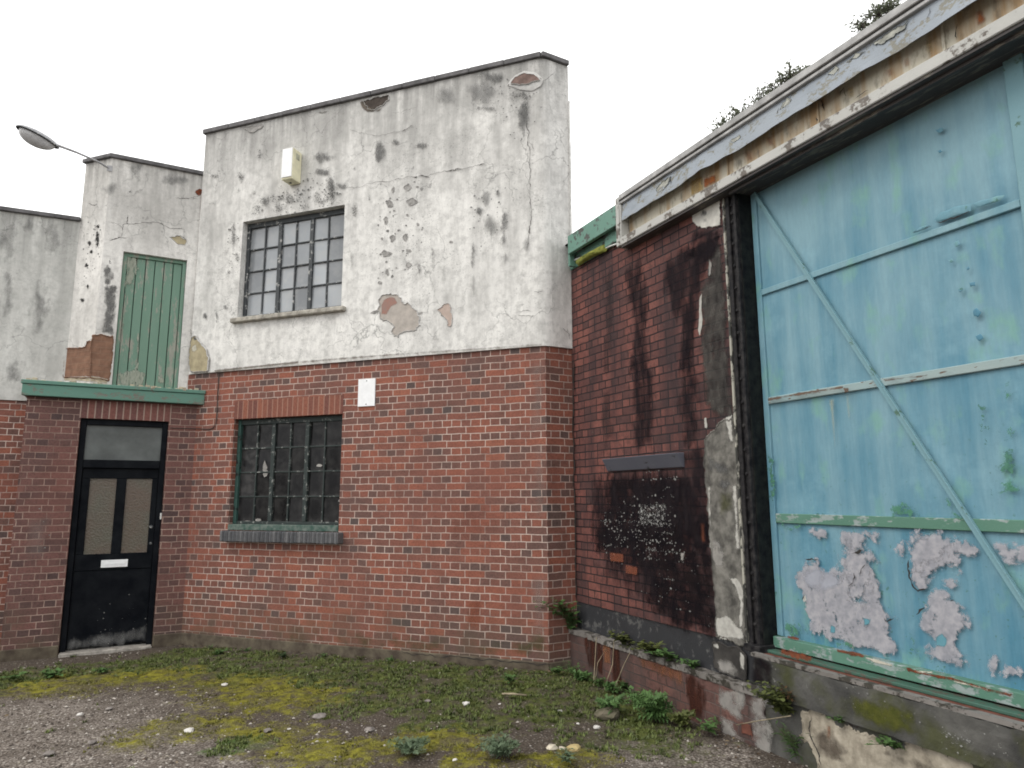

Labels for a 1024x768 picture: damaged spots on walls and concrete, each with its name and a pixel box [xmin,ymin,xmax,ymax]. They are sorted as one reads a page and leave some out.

peeling [370,176,423,337]
leakage [665,231,716,333]
spalling [692,201,720,229]
spalling [63,328,145,386]
spalling [188,335,209,373]
leakage [626,265,652,446]
leakage [683,346,696,444]
leakage [604,470,685,560]
spalling [698,247,747,682]
peeling [785,530,897,655]
peeling [894,528,978,671]
spalling [799,709,973,768]